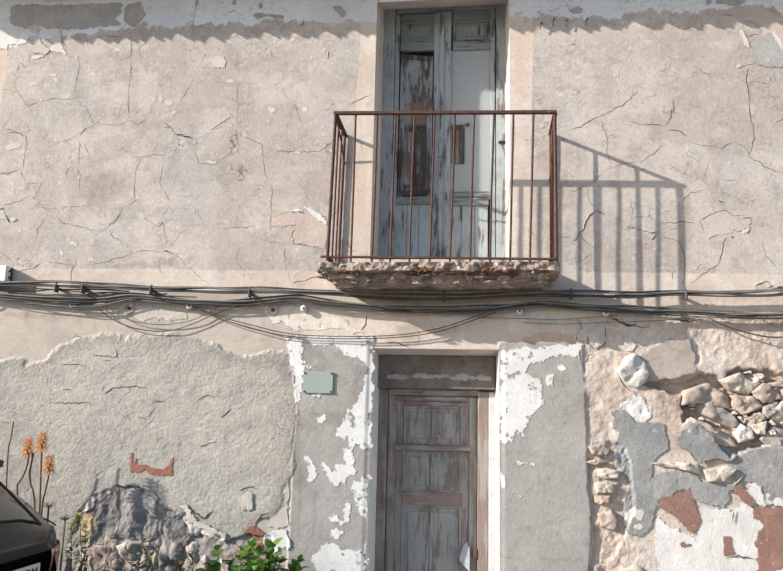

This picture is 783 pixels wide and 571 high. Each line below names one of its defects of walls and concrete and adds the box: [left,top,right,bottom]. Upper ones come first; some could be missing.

peeling [0,2,146,60]
crack [1,27,332,283]
spalling [271,206,328,249]
crack [569,95,662,260]
crack [622,167,750,285]
crack [634,63,782,173]
crack [62,351,117,366]
crack [102,376,166,419]
spalling [78,485,227,571]
peeling [255,305,376,571]
peeling [387,325,605,444]
spalling [587,370,783,571]